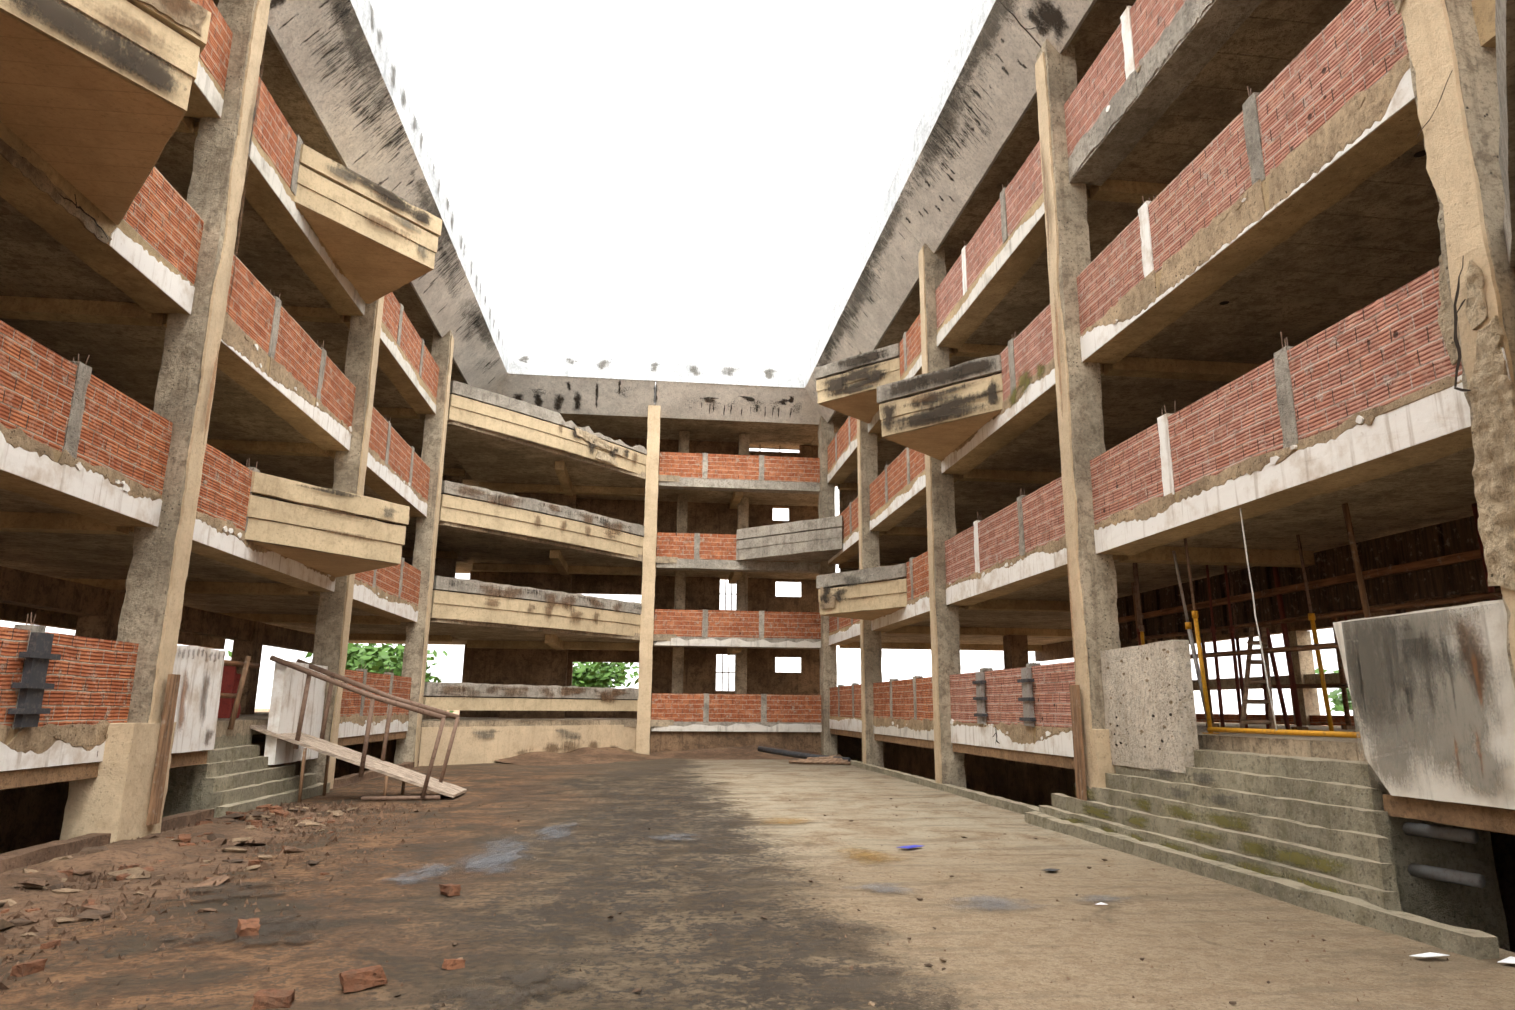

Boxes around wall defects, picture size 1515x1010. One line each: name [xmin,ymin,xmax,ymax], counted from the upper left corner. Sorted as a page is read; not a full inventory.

damp [13,0,178,92]
damp [270,0,501,383]
damp [816,0,1069,431]
flaking render [0,422,160,501]
damp [513,360,637,463]
damp [685,396,802,417]
spalling [1096,253,1515,591]
flaking render [0,720,111,754]
damp [1341,606,1506,795]